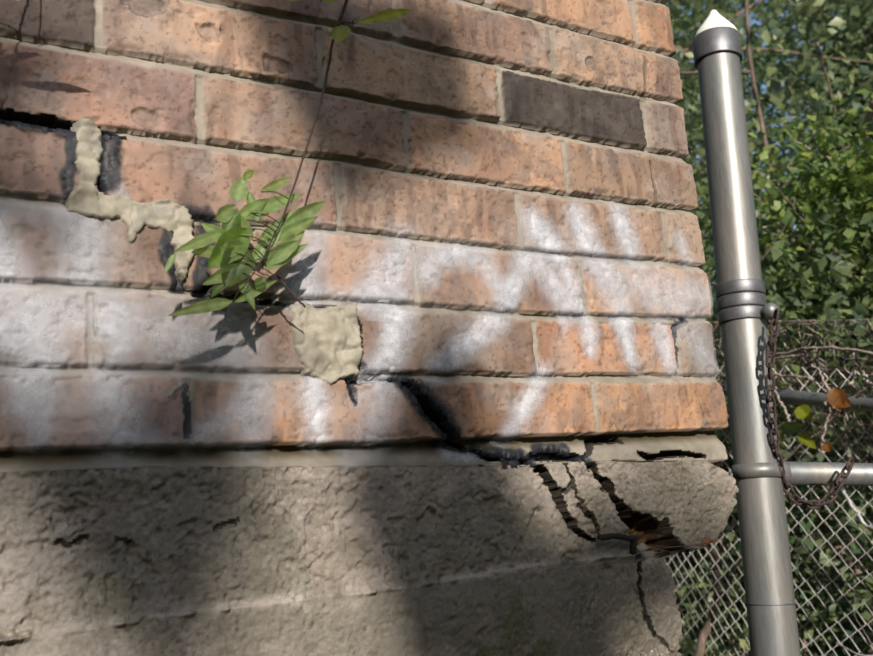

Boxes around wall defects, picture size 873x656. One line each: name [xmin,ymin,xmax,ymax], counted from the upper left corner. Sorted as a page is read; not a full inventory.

crack [0,107,77,132]
crack [190,284,337,308]
crack [344,316,414,407]
crack [529,435,707,542]
crack [633,547,674,653]